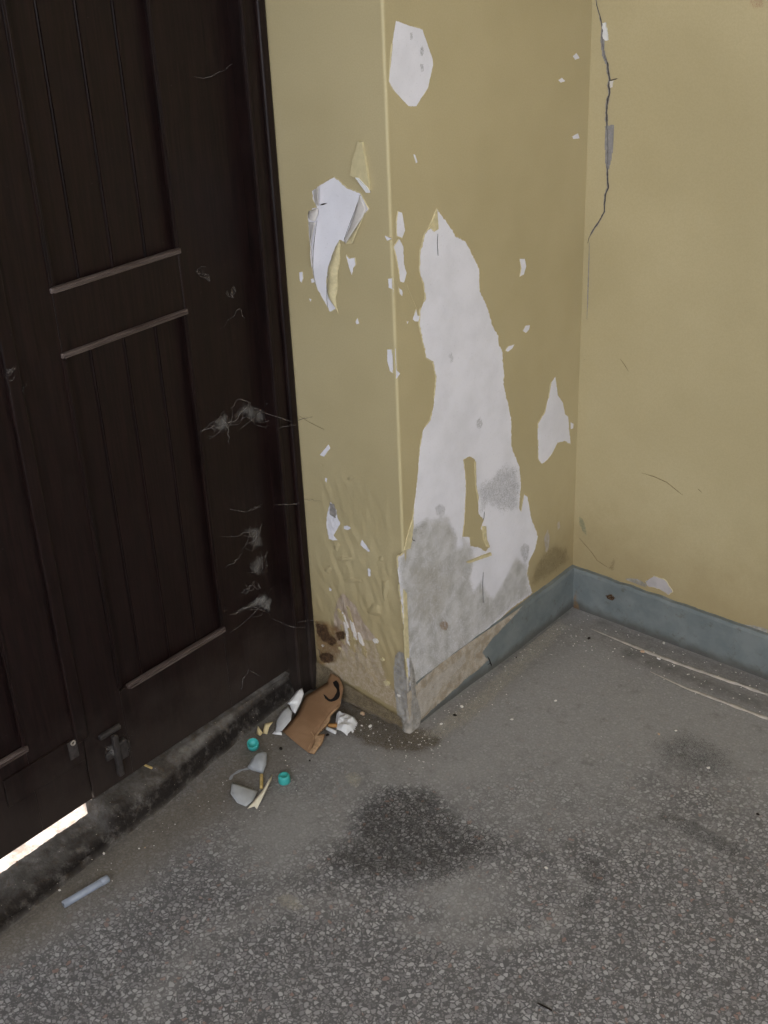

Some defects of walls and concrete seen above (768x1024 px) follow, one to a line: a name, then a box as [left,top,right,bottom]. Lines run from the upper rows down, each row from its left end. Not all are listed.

peeling [388,20,433,107]
crack [587,0,618,310]
peeling [299,141,371,312]
peeling [321,208,538,734]
peeling [537,377,574,463]
peeling [625,575,673,595]
water stain [323,772,510,892]